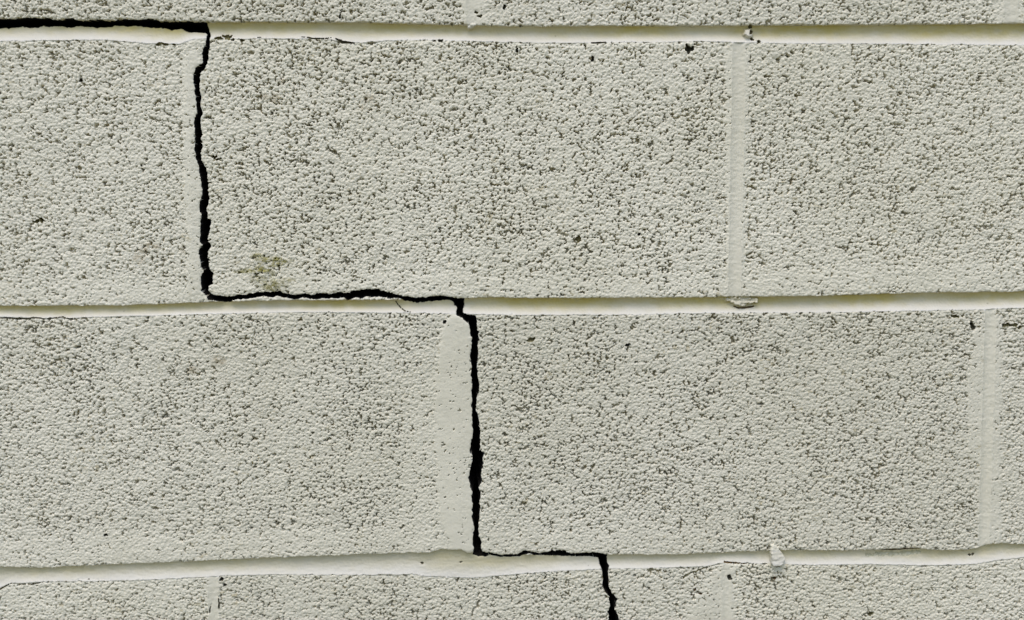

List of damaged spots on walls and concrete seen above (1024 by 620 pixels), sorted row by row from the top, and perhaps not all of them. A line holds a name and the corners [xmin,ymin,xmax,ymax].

crack [0,17,619,620]
crack [302,6,355,44]